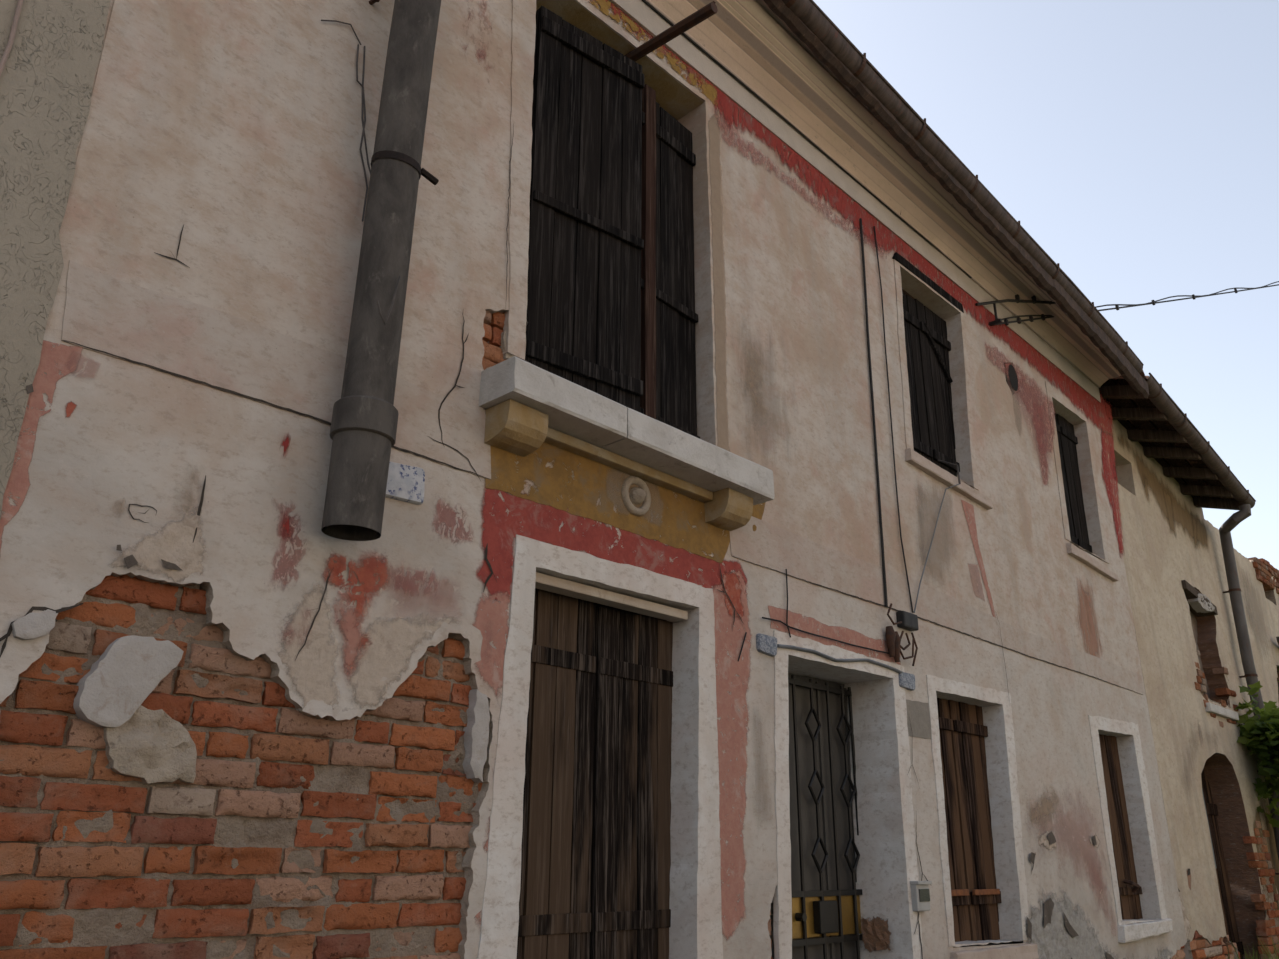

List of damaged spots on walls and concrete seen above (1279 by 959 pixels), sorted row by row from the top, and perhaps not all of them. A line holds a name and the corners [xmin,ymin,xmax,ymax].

peeling [589,0,1124,555]
spalling [482,311,514,370]
spalling [1188,593,1215,613]
spalling [1247,557,1279,594]
spalling [0,442,752,959]
spalling [1194,649,1239,728]
spalling [1242,821,1279,959]
spalling [1026,893,1114,959]
spalling [1159,930,1240,959]